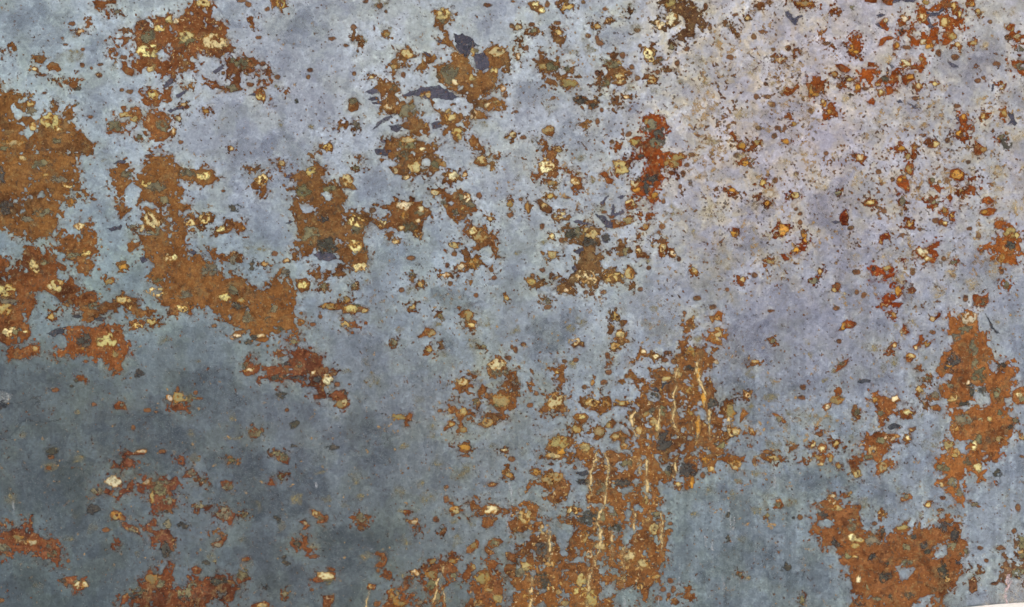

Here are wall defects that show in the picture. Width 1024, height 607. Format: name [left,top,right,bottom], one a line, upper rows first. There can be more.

corrosion [237,0,296,44]
corrosion [429,303,477,335]
corrosion [851,404,867,425]
corrosion [70,367,376,607]
corrosion [487,446,516,487]
corrosion [0,504,107,595]